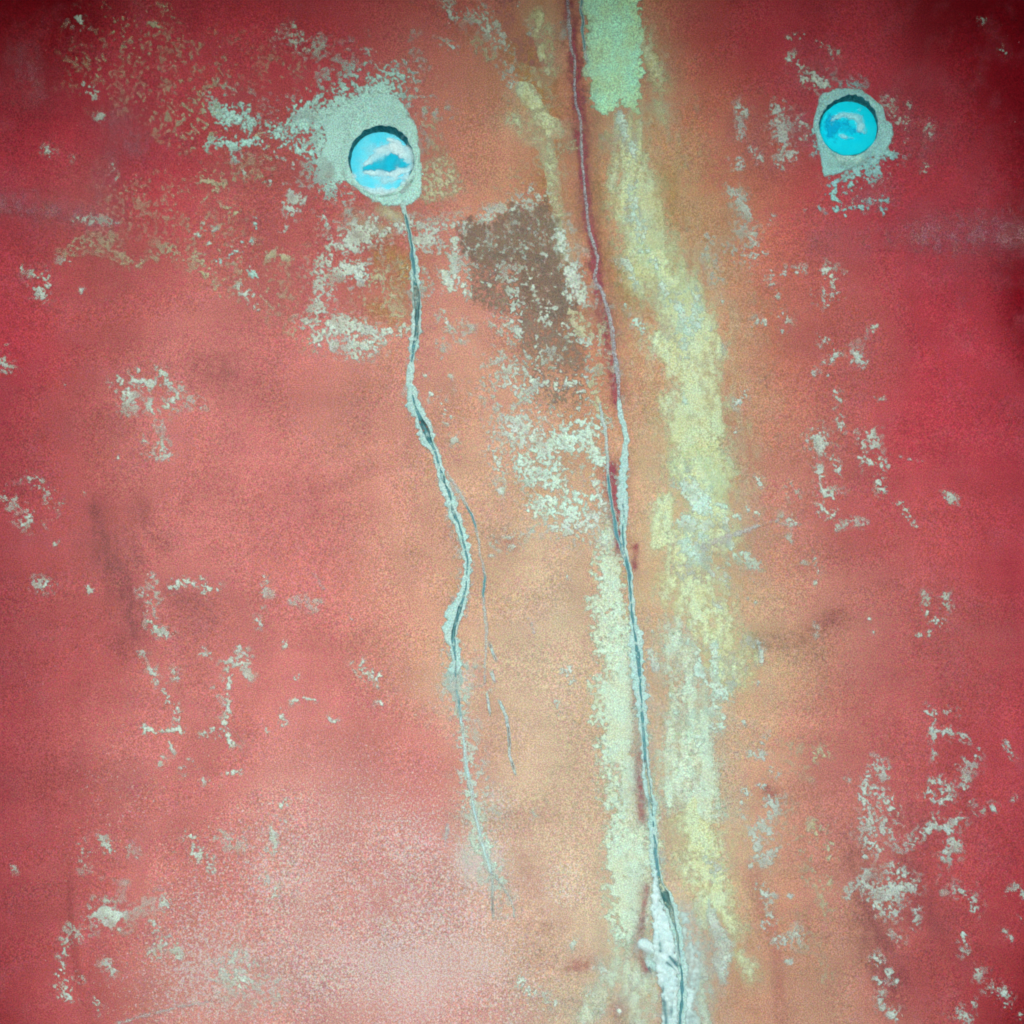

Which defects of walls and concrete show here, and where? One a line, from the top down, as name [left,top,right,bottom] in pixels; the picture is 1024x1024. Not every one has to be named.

peeling [443,0,553,130]
peeling [735,53,904,217]
peeling [155,222,259,311]
peeling [183,61,610,545]
peeling [109,366,188,460]
crack [400,201,516,918]
water stain [456,0,760,1024]
crack [566,0,689,1024]
peeling [845,759,964,918]
peeling [924,710,968,760]
peeling [924,748,980,805]
peeling [873,954,899,1021]